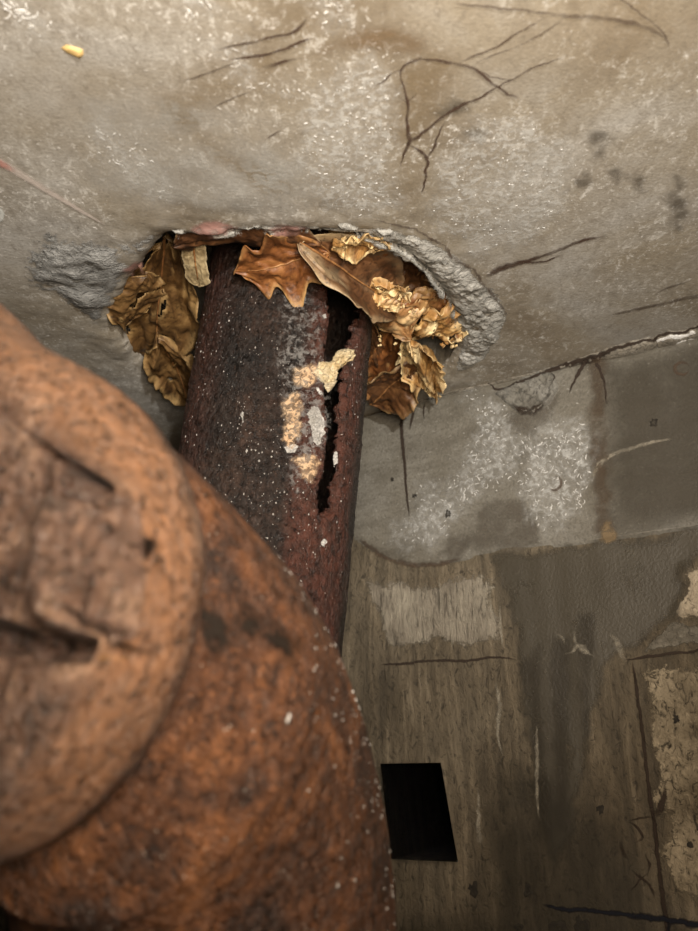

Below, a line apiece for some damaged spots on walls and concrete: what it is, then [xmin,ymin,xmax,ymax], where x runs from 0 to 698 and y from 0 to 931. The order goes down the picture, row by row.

crack [380,0,639,190]
spalling [172,222,506,370]
crack [490,237,596,274]
crack [420,326,698,400]
crack [617,286,684,314]
water stain [401,394,698,931]
peeling [676,567,698,619]
peeling [642,664,698,897]